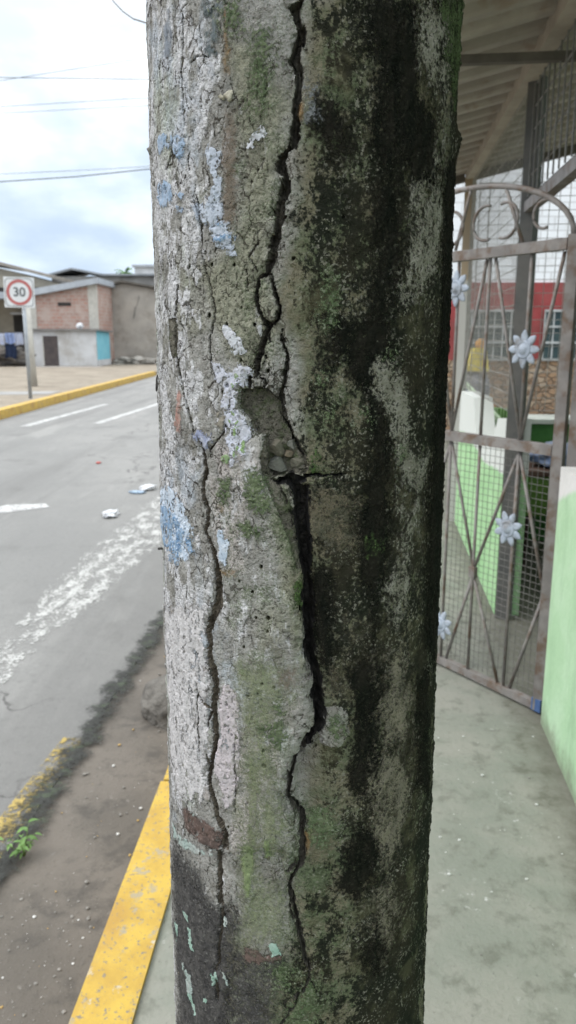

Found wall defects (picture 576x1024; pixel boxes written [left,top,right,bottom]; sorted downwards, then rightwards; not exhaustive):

peeling [147,132,185,159]
peeling [152,144,237,257]
crack [197,197,216,377]
peeling [158,483,195,570]
crack [174,285,237,999]
spalling [192,325,309,569]
crack [246,0,343,1024]
leakage [303,0,464,979]